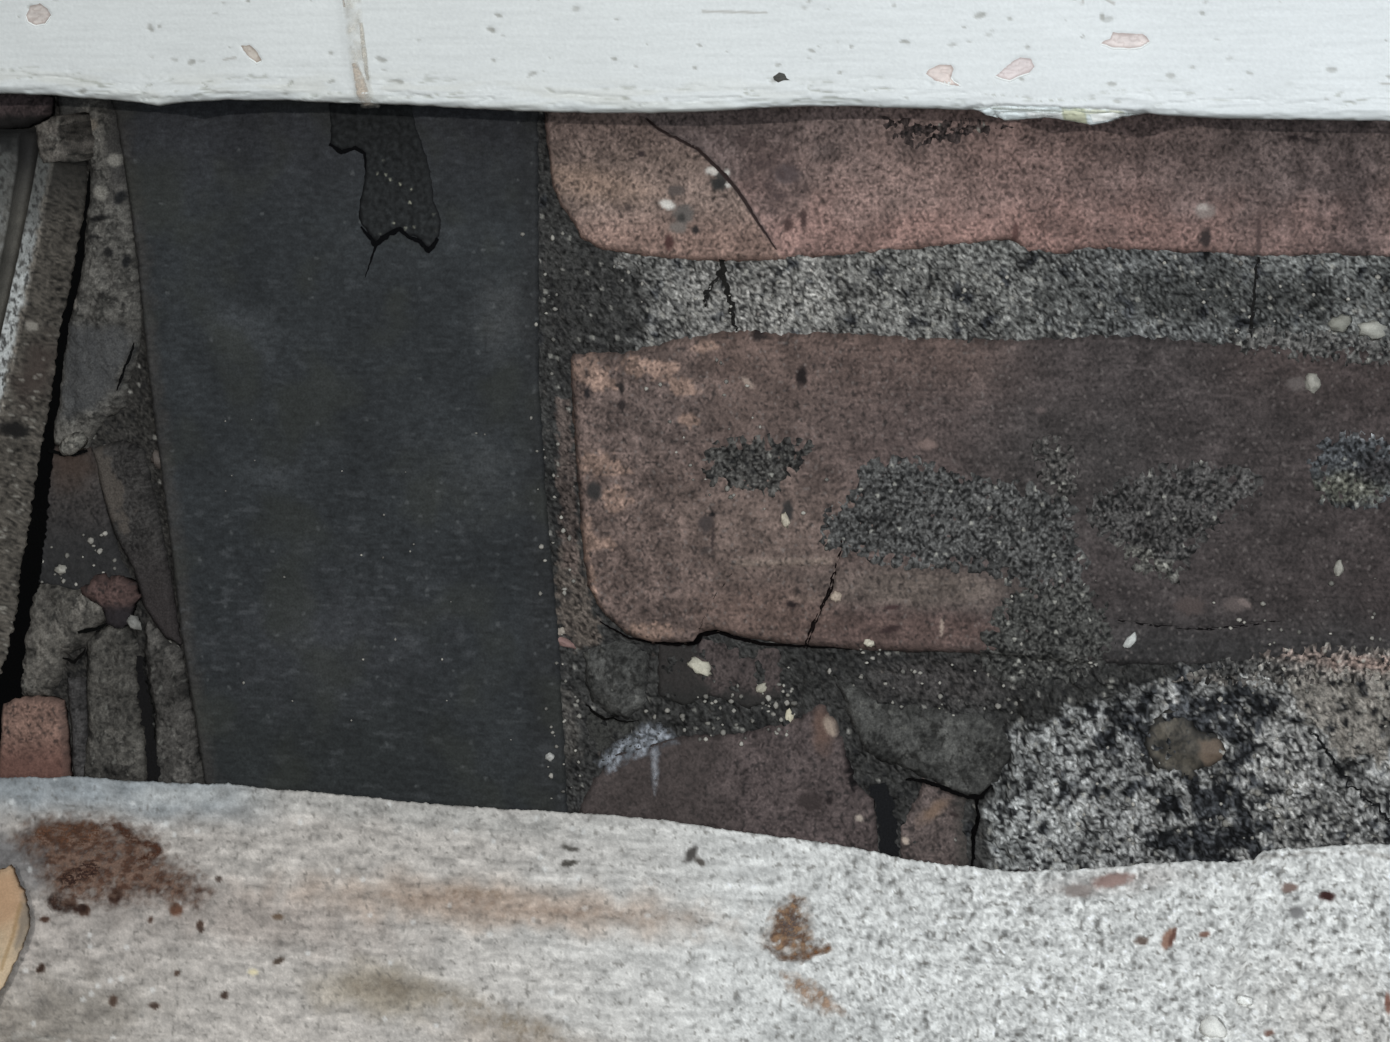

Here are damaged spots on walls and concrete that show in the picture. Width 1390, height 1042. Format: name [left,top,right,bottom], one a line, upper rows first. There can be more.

spalling [329,103,441,277]
crack [703,259,739,331]
crack [600,540,852,650]
rust [16,818,212,912]
rust [764,895,830,960]
rust [785,976,831,1009]